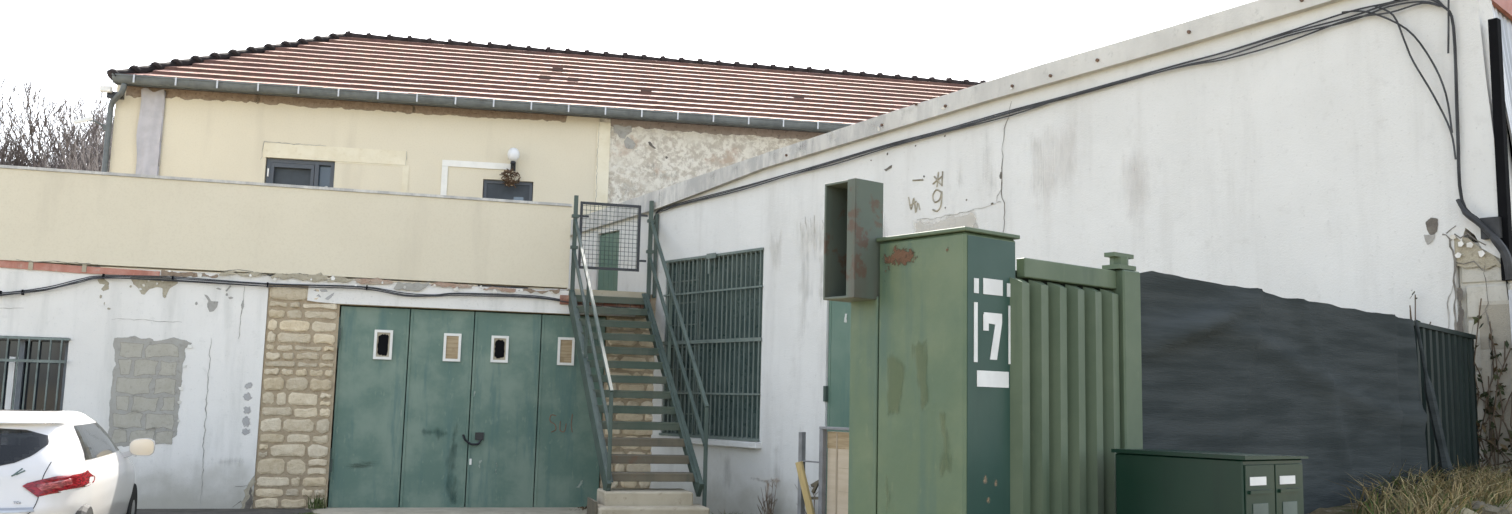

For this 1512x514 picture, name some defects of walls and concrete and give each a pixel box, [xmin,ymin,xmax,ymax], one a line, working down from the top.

peeling [108,336,192,447]